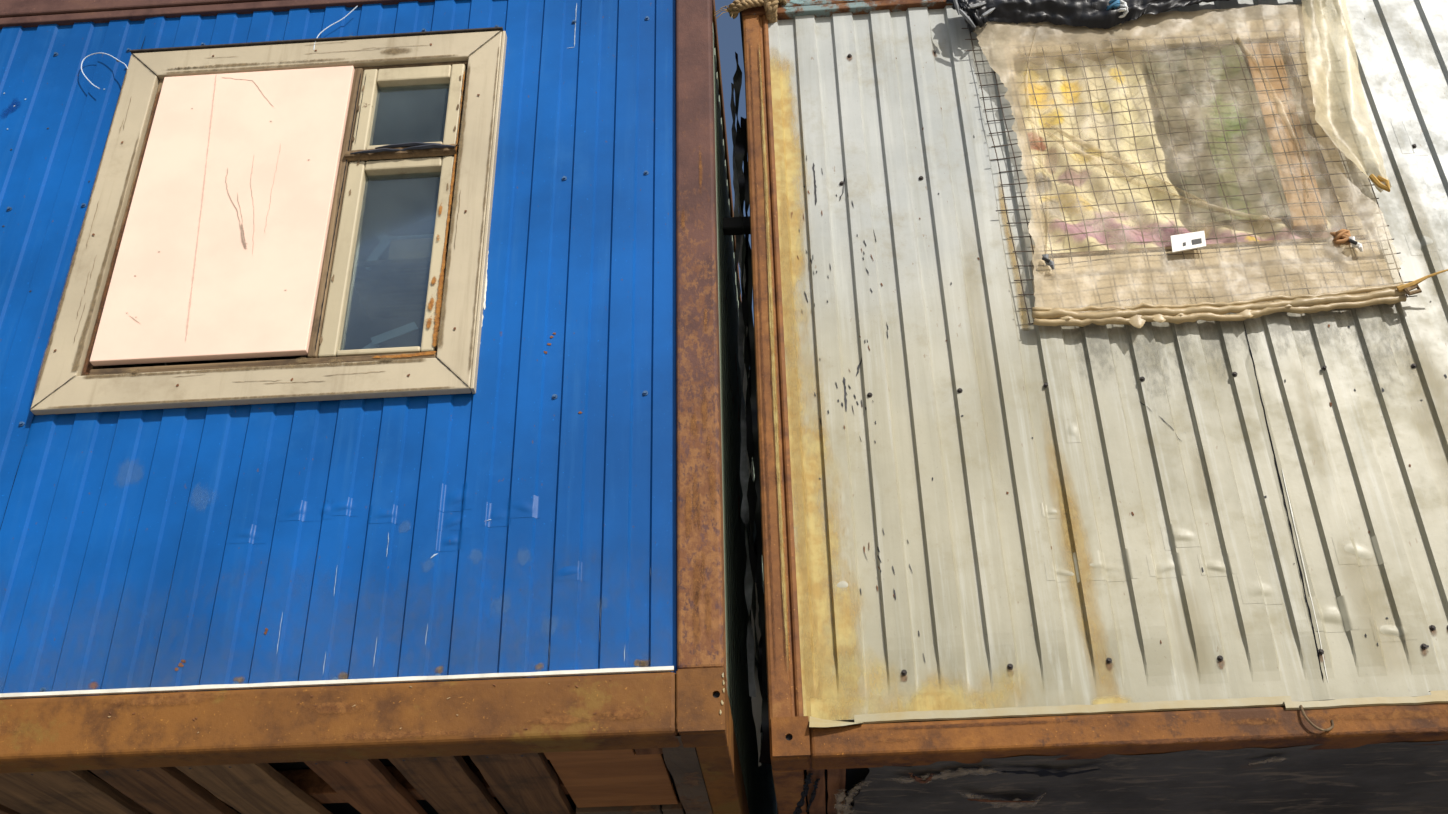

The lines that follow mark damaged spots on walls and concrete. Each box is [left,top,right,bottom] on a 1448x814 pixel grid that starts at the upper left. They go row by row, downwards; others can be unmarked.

rust [372,72,465,358]
rust [749,48,1060,742]
crack [1243,321,1329,683]